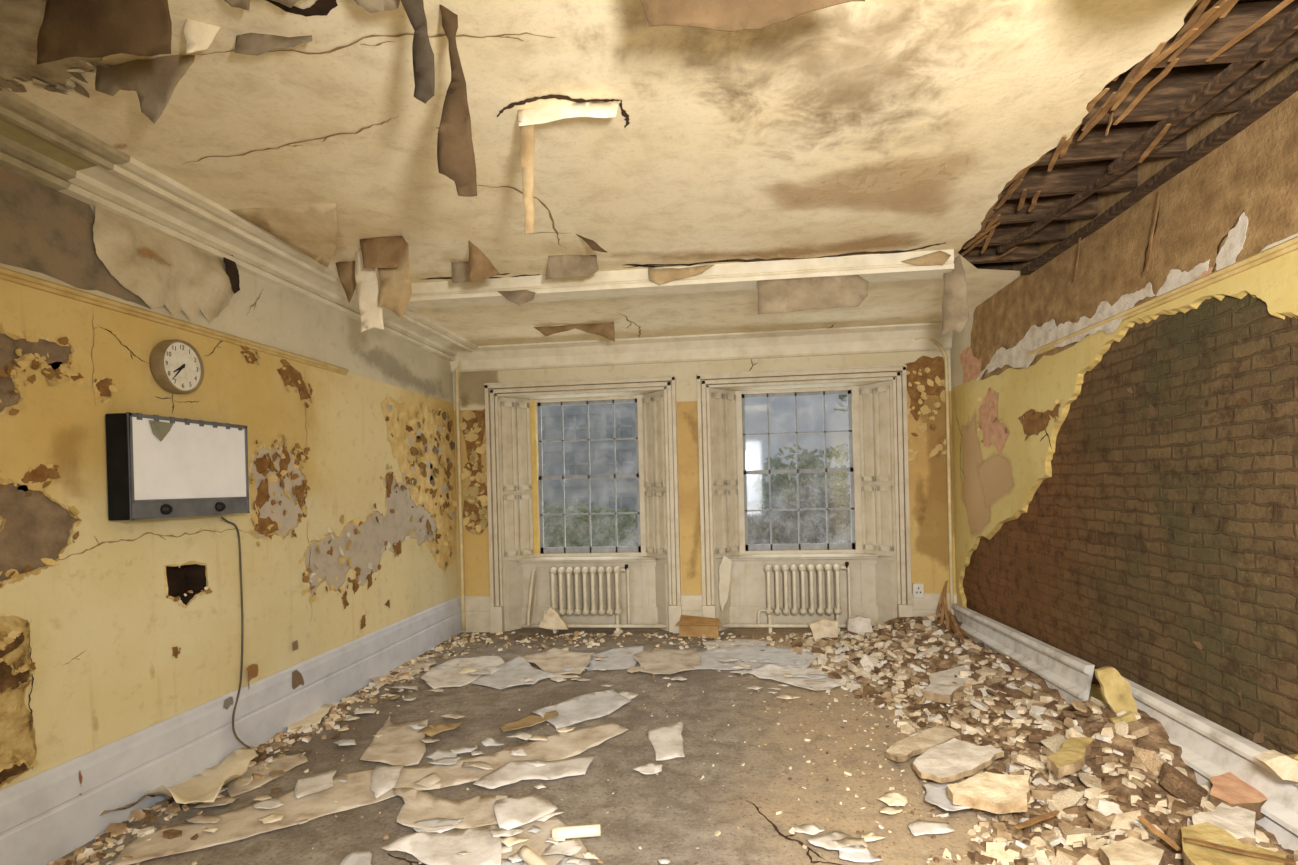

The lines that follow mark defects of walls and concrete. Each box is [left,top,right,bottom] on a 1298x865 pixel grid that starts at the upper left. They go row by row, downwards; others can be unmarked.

peeling [0,62,96,98]
crack [268,32,555,54]
peeling [0,323,118,417]
peeling [906,356,947,461]
flaking render [959,58,1298,760]
peeling [0,463,82,589]
peeling [248,396,493,609]